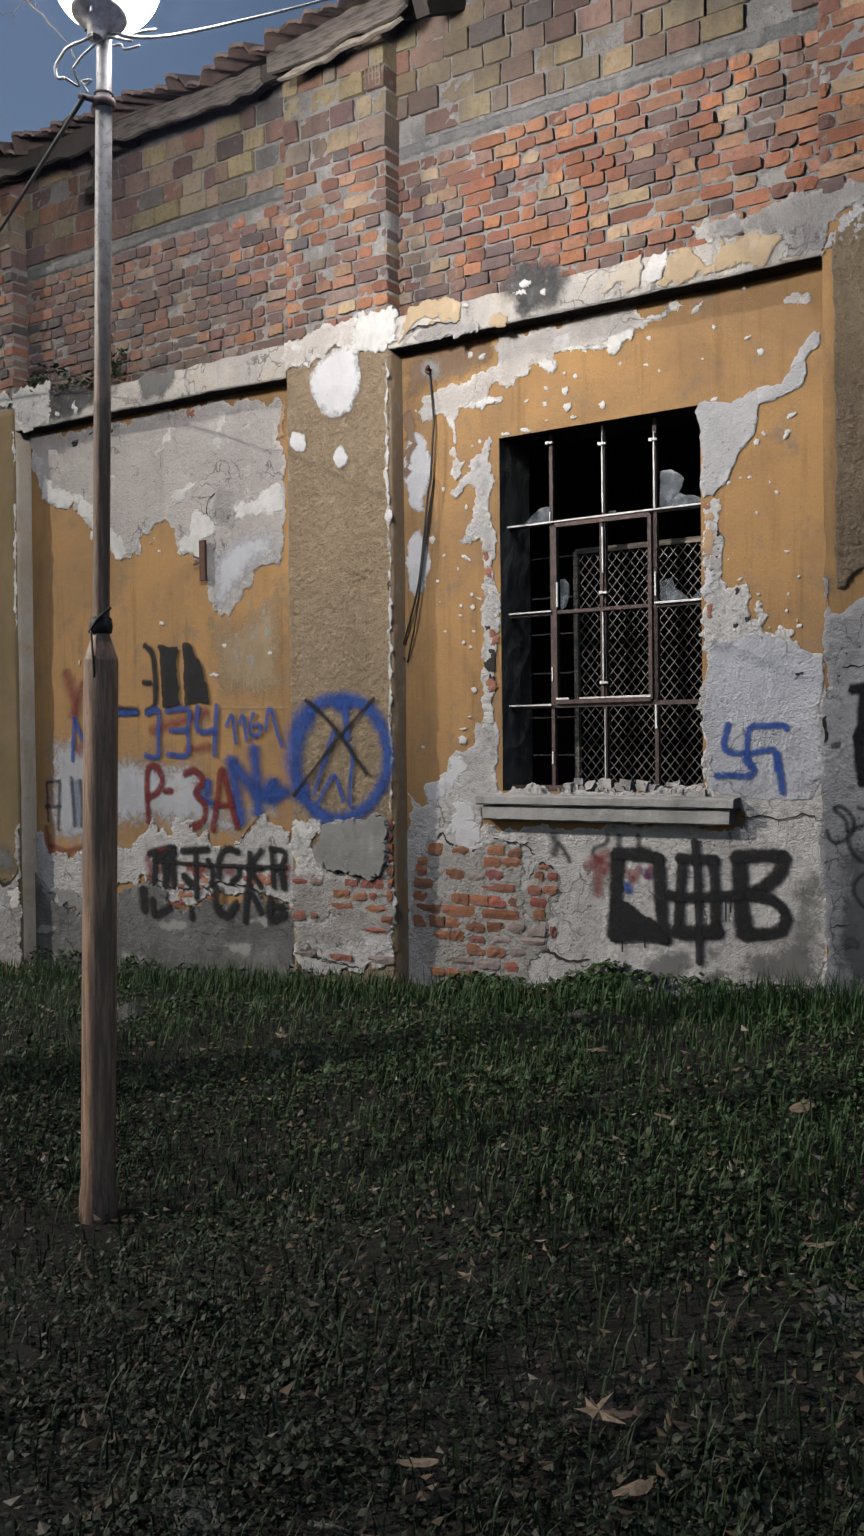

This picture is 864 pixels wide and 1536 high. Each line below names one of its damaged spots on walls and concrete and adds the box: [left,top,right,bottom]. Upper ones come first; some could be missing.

peeling [0,380,286,617]
peeling [117,178,864,1005]
peeling [0,823,82,972]